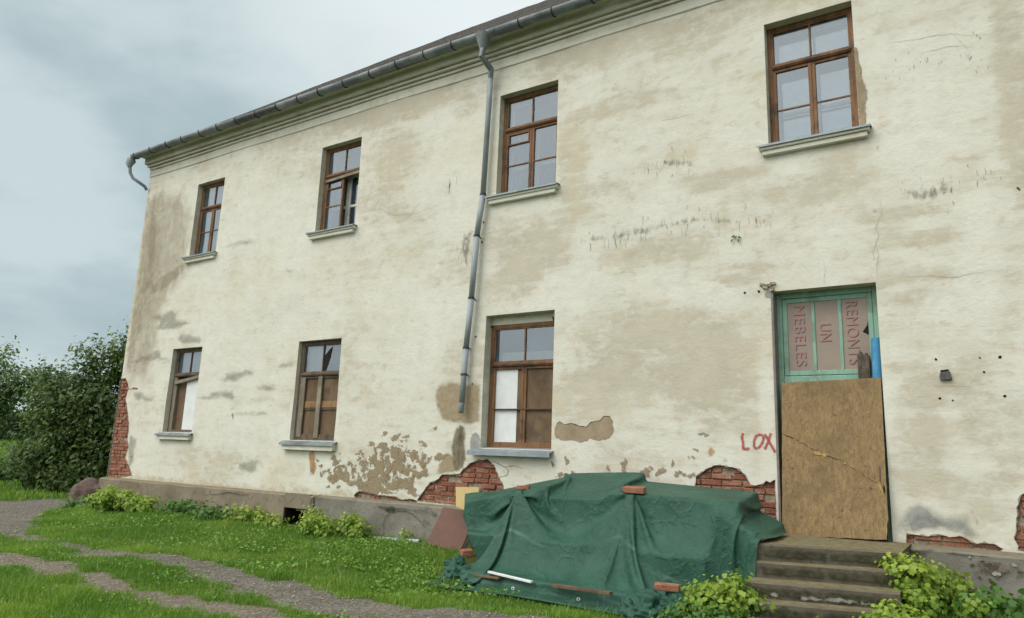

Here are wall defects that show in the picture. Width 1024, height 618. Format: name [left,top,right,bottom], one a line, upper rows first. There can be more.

peeling [854,47,867,125]
flaking render [107,378,138,478]
peeling [554,416,614,442]
peeling [310,431,504,506]
flaking render [640,459,777,520]
flaking render [1014,494,1024,551]
flaking render [906,533,1024,581]